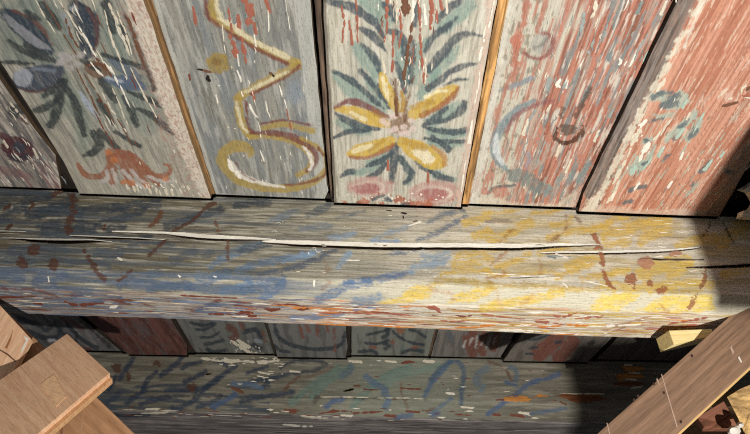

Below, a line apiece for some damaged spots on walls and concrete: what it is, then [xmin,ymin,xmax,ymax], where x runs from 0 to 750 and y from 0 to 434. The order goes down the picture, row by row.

peeling [478,1,495,61]
peeling [565,0,629,70]
peeling [606,33,649,68]
peeling [521,68,574,164]
peeling [563,158,591,205]
peeling [606,98,710,212]
crack [0,231,750,269]
crack [508,272,548,280]